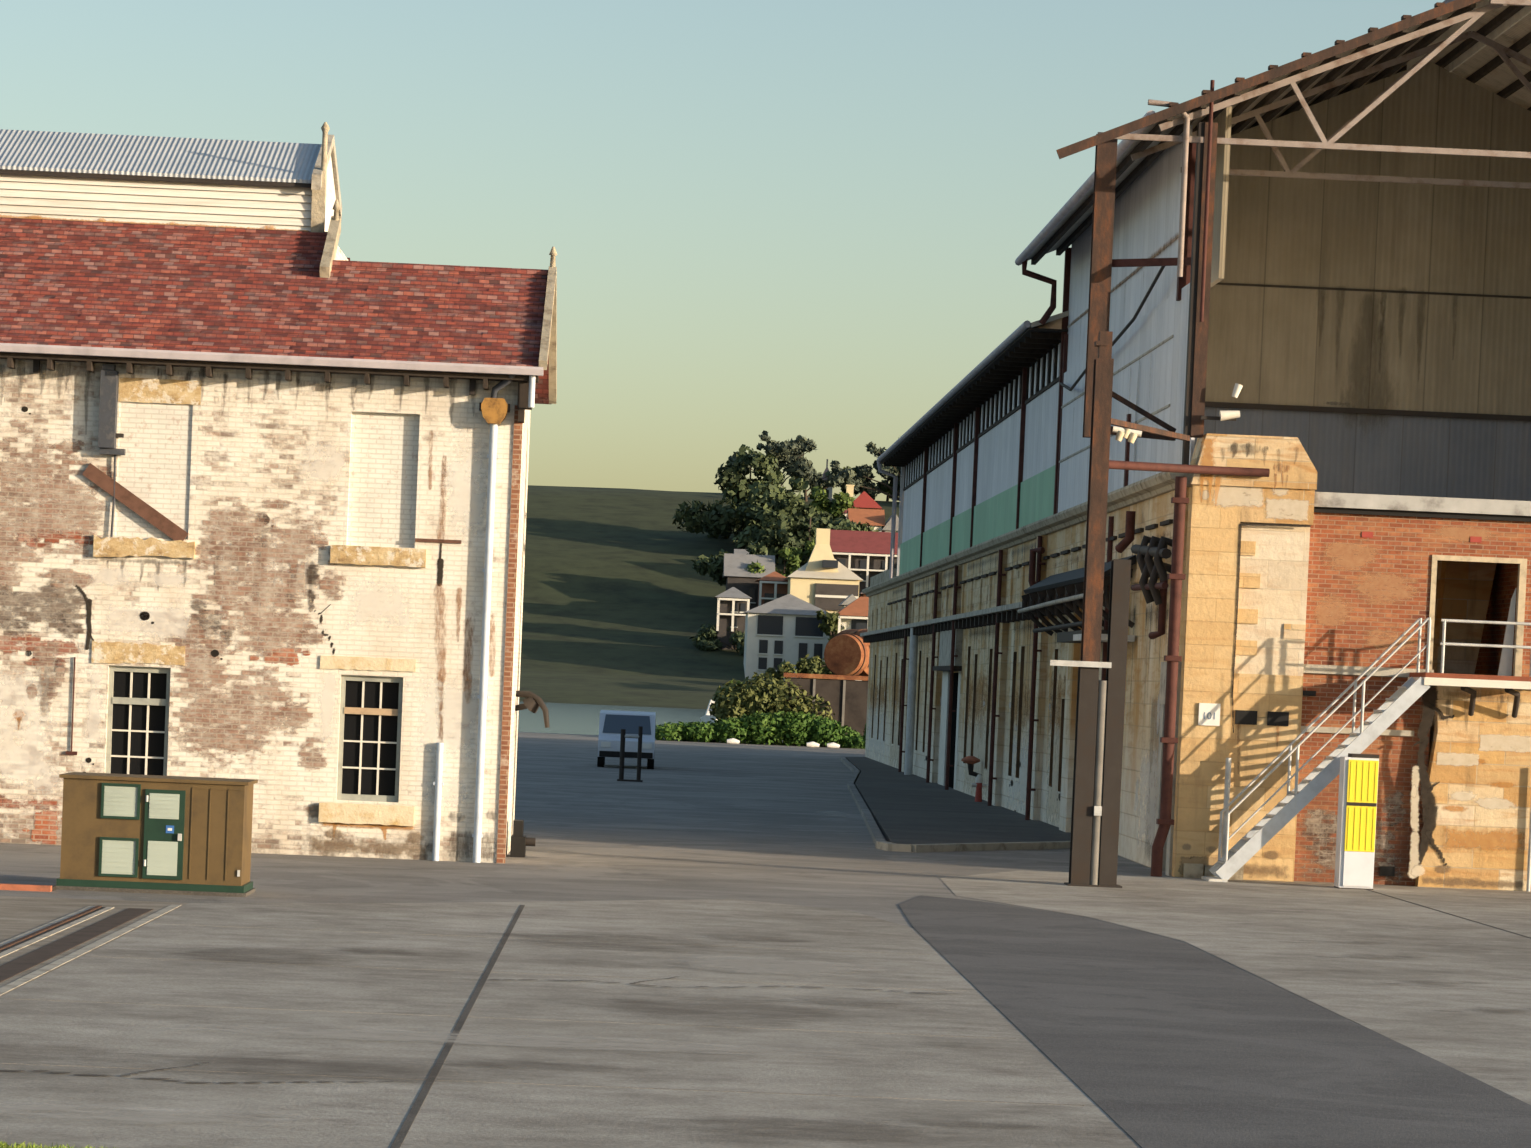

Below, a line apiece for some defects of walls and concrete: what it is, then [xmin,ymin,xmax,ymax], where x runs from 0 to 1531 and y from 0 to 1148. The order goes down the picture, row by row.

peeling [0,406,114,592]
corrosion [429,458,446,537]
peeling [0,634,79,715]
peeling [172,498,344,769]
corrosion [436,587,472,739]
crack [1414,685,1454,866]